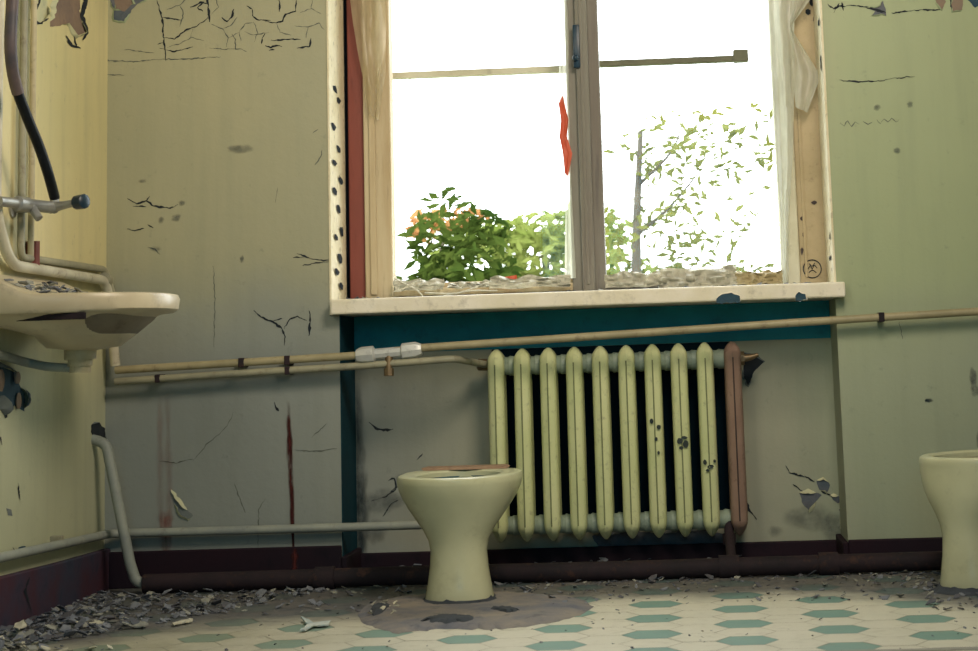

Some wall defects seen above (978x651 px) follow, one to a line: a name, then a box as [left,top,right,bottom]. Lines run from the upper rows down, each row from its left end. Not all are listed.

peeling [29,0,89,49]
crack [108,0,322,76]
peeling [864,1,903,16]
peeling [935,0,978,13]
crack [127,196,178,253]
crack [254,311,311,345]
flaking render [0,362,31,418]
rust [287,415,298,570]
peeling [786,466,841,529]